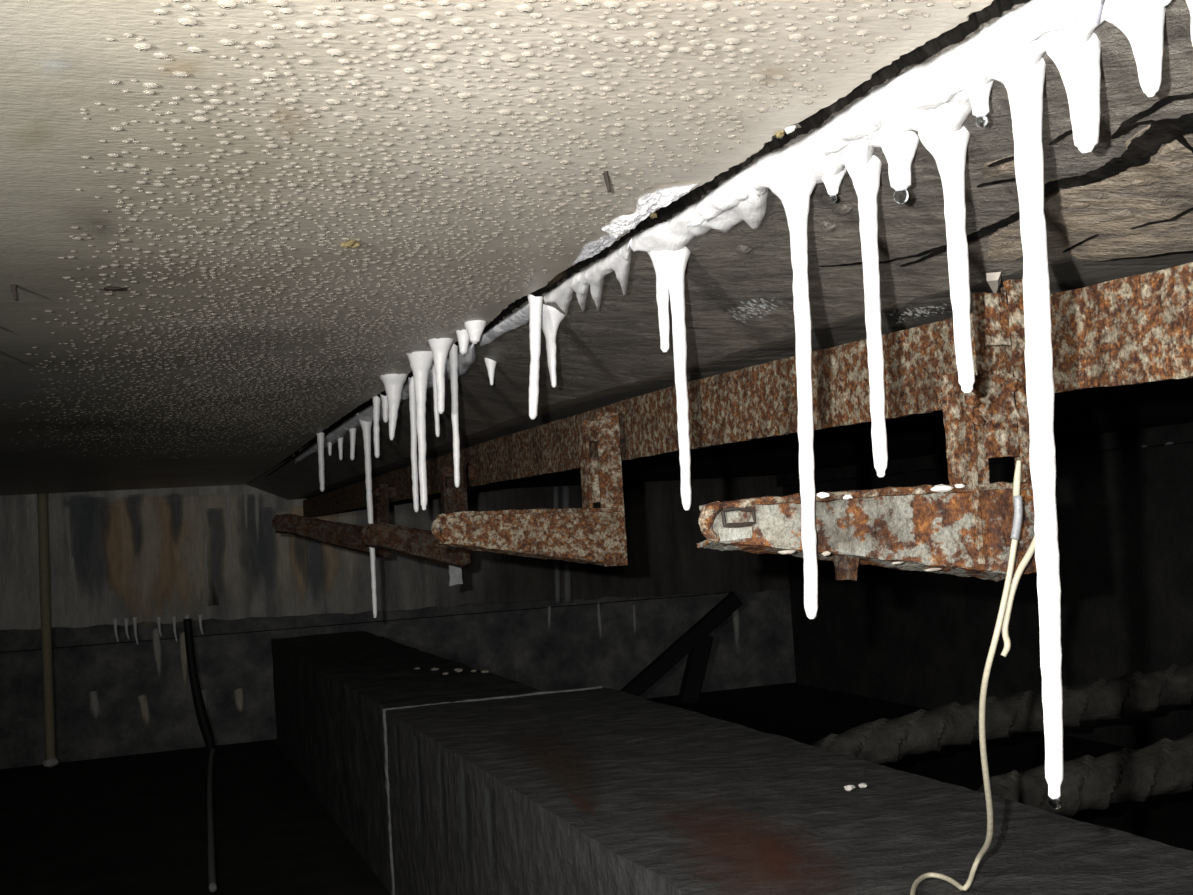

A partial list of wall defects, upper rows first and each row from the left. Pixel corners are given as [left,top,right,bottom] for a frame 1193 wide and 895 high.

efflorescence [544,0,1172,316]
crack [1044,93,1193,198]
crack [265,0,1030,476]
crack [1062,234,1099,253]
crack [1130,207,1193,229]
efflorescence [729,297,777,323]
efflorescence [427,303,529,390]
efflorescence [400,382,409,403]
efflorescence [295,400,383,464]
water stain [930,484,965,493]
corrosion [272,506,358,595]